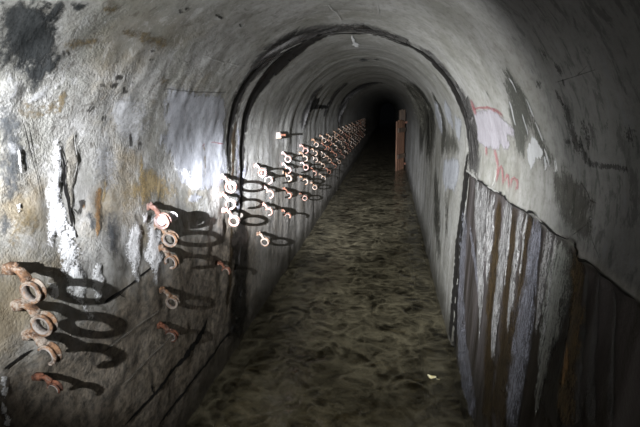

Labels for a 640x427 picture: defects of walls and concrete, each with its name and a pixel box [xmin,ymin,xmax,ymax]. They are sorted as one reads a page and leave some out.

leakage [0,0,87,92]
peeling [474,69,557,172]
crack [60,135,82,227]
leakage [45,140,104,319]
rust [95,182,106,235]
rust [132,157,176,205]
crack [227,5,634,347]
rust [482,198,533,427]
rust [540,249,574,427]